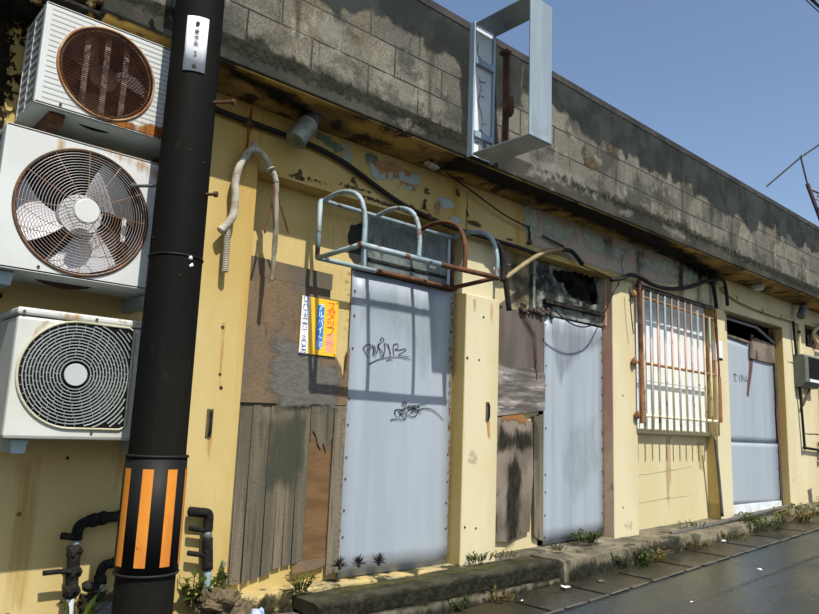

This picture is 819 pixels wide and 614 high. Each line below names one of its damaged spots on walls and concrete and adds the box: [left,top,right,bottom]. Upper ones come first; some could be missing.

leakage [318,21,343,43]
peeling [0,17,28,130]
leakage [322,0,470,136]
leakage [495,45,529,108]
rust [102,119,162,139]
peeling [288,169,326,185]
peeling [339,177,394,208]
peeling [365,153,481,227]
leakage [552,78,819,253]
leakage [498,429,533,451]
leakage [507,459,521,542]